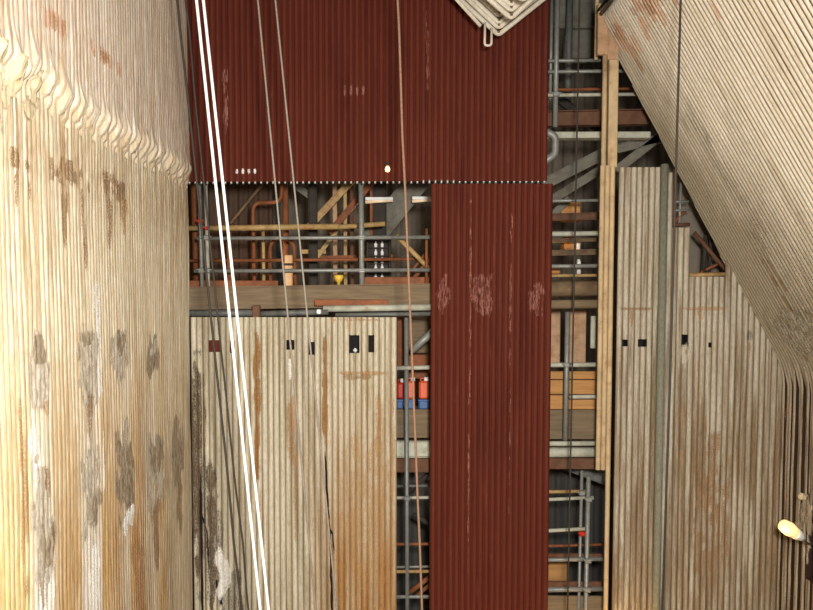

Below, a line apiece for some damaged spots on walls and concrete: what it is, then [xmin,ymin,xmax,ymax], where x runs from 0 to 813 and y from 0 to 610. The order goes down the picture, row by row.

corrosion [611,0,667,74]
leakage [92,273,103,402]
leakage [201,457,231,610]
corrosion [285,397,299,540]
corrosion [336,393,395,610]